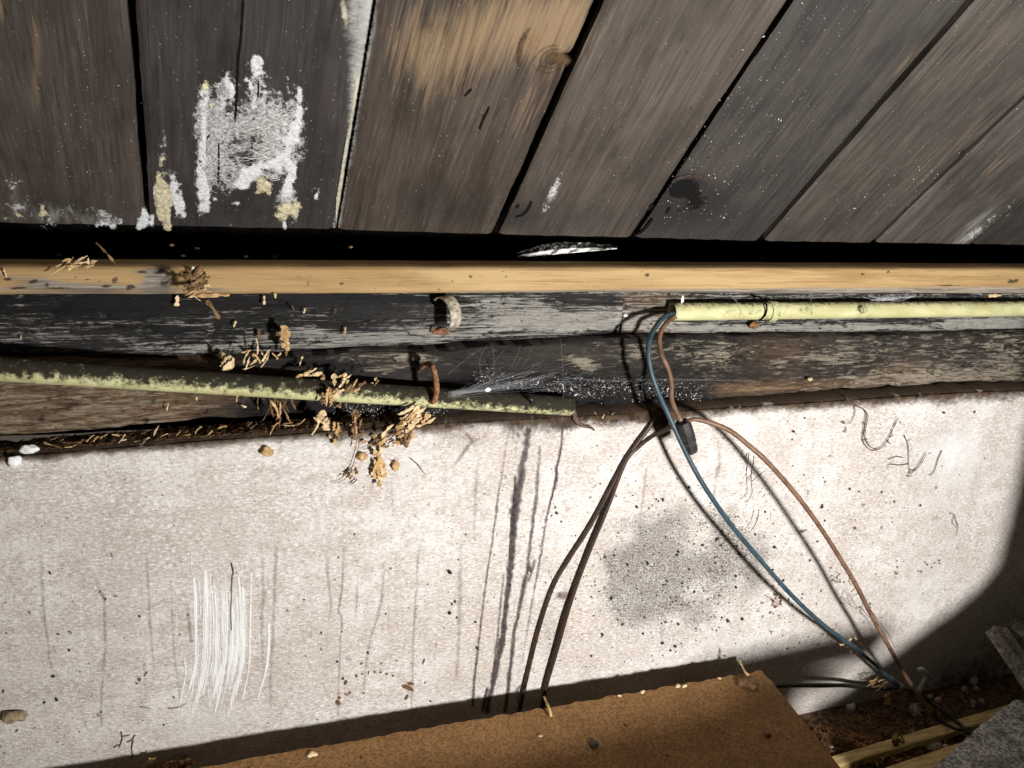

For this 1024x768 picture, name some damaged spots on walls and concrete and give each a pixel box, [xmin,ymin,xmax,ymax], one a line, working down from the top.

damp [21,428,401,460]
damp [414,371,1024,714]